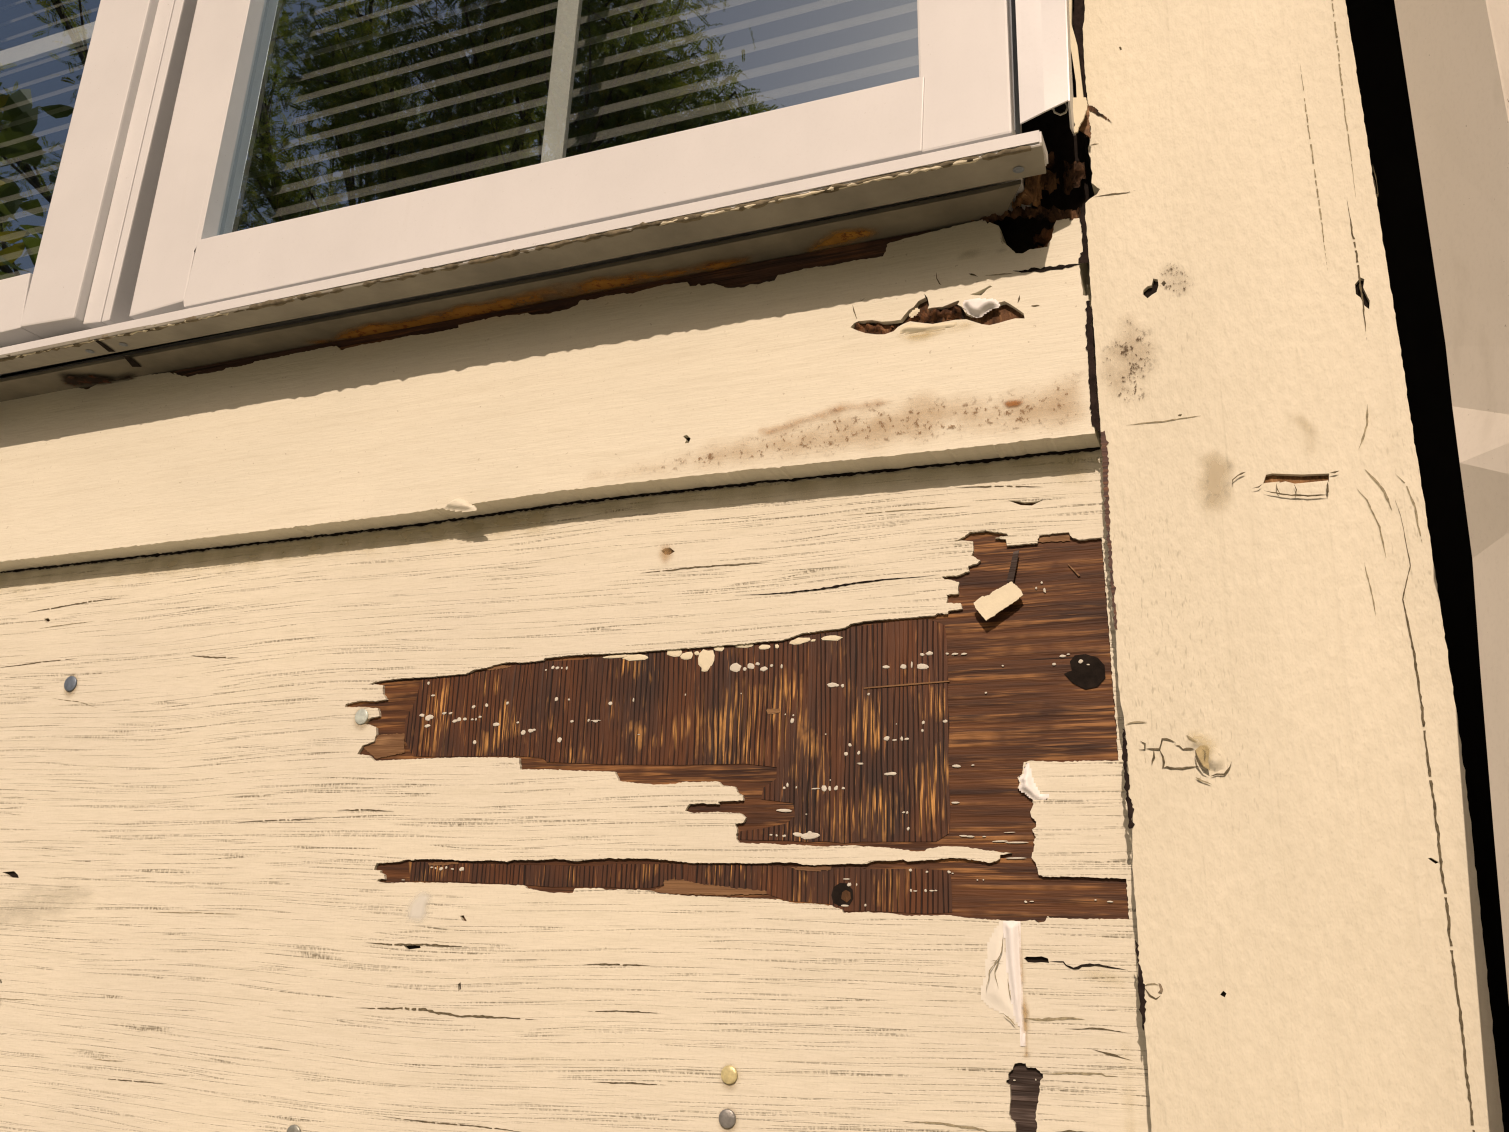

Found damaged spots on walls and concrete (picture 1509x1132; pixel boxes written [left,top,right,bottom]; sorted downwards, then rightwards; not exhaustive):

spalling [971,107,1089,253]
rust [576,260,744,293]
rust [316,290,550,343]
peeling [170,230,931,377]
spalling [860,294,1024,334]
damp [686,386,1076,463]
peeling [348,532,1129,1132]
crack [373,941,465,949]
crack [587,960,648,968]
crack [368,1007,534,1020]
crack [1026,940,1147,1077]
crack [390,1117,519,1132]